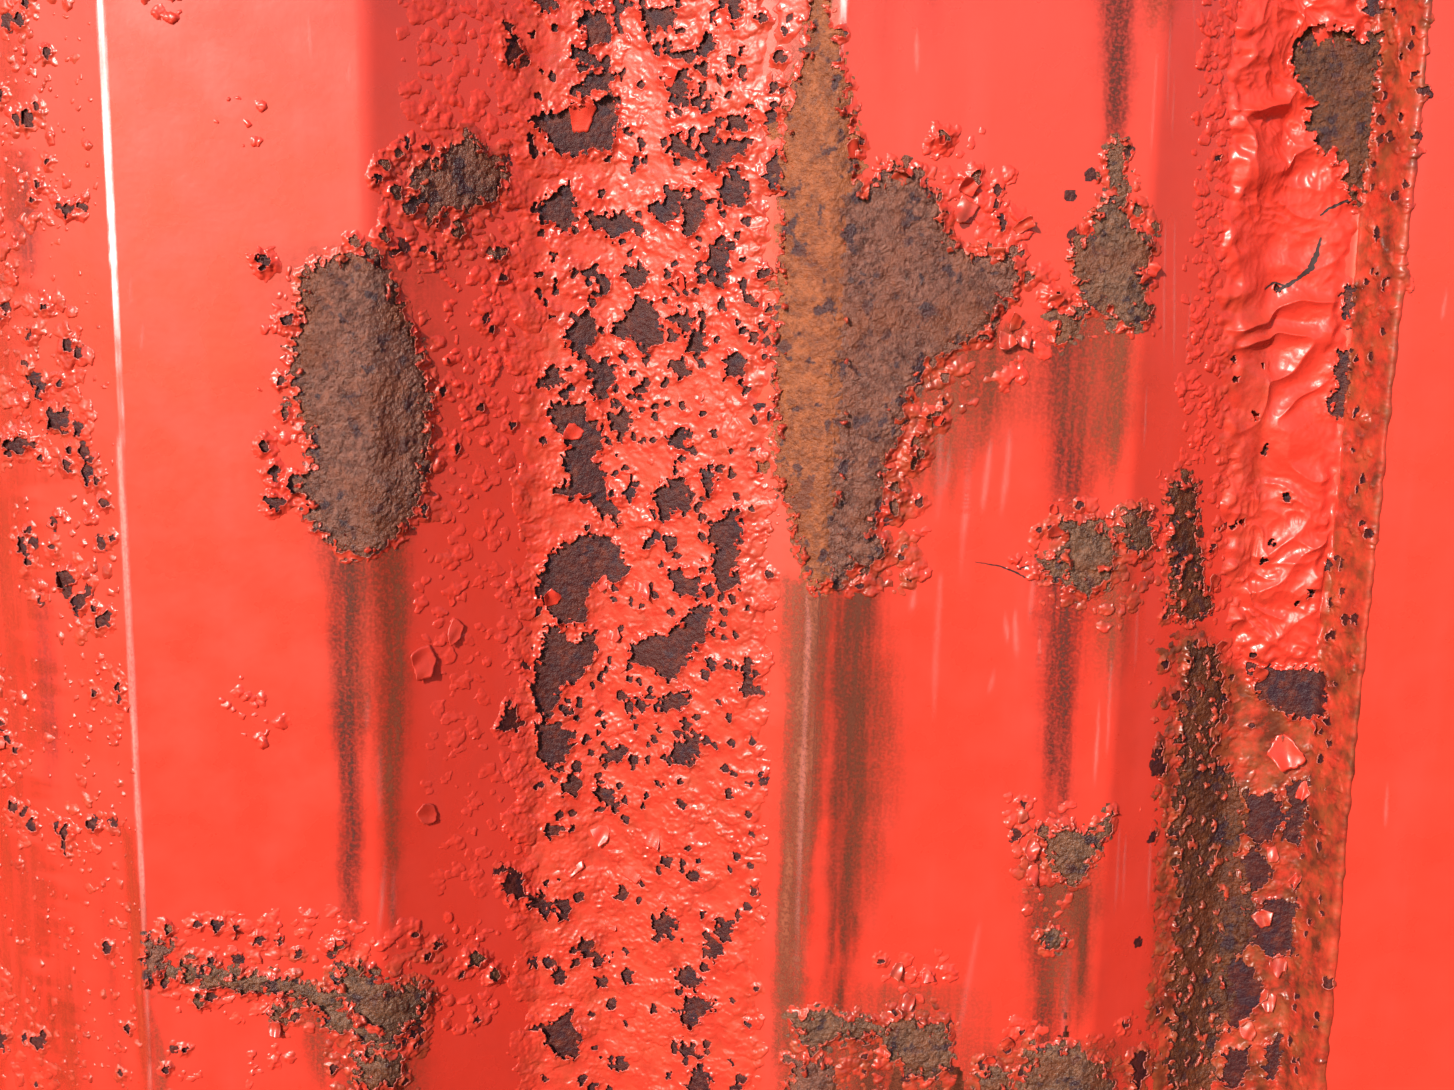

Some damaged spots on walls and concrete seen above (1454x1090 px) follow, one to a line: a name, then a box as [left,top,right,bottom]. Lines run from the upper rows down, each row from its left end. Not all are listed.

peeling [0,0,148,1090]
corrosion [123,226,513,1090]
corrosion [371,127,511,240]
peeling [488,0,793,1090]
corrosion [756,0,1327,1090]